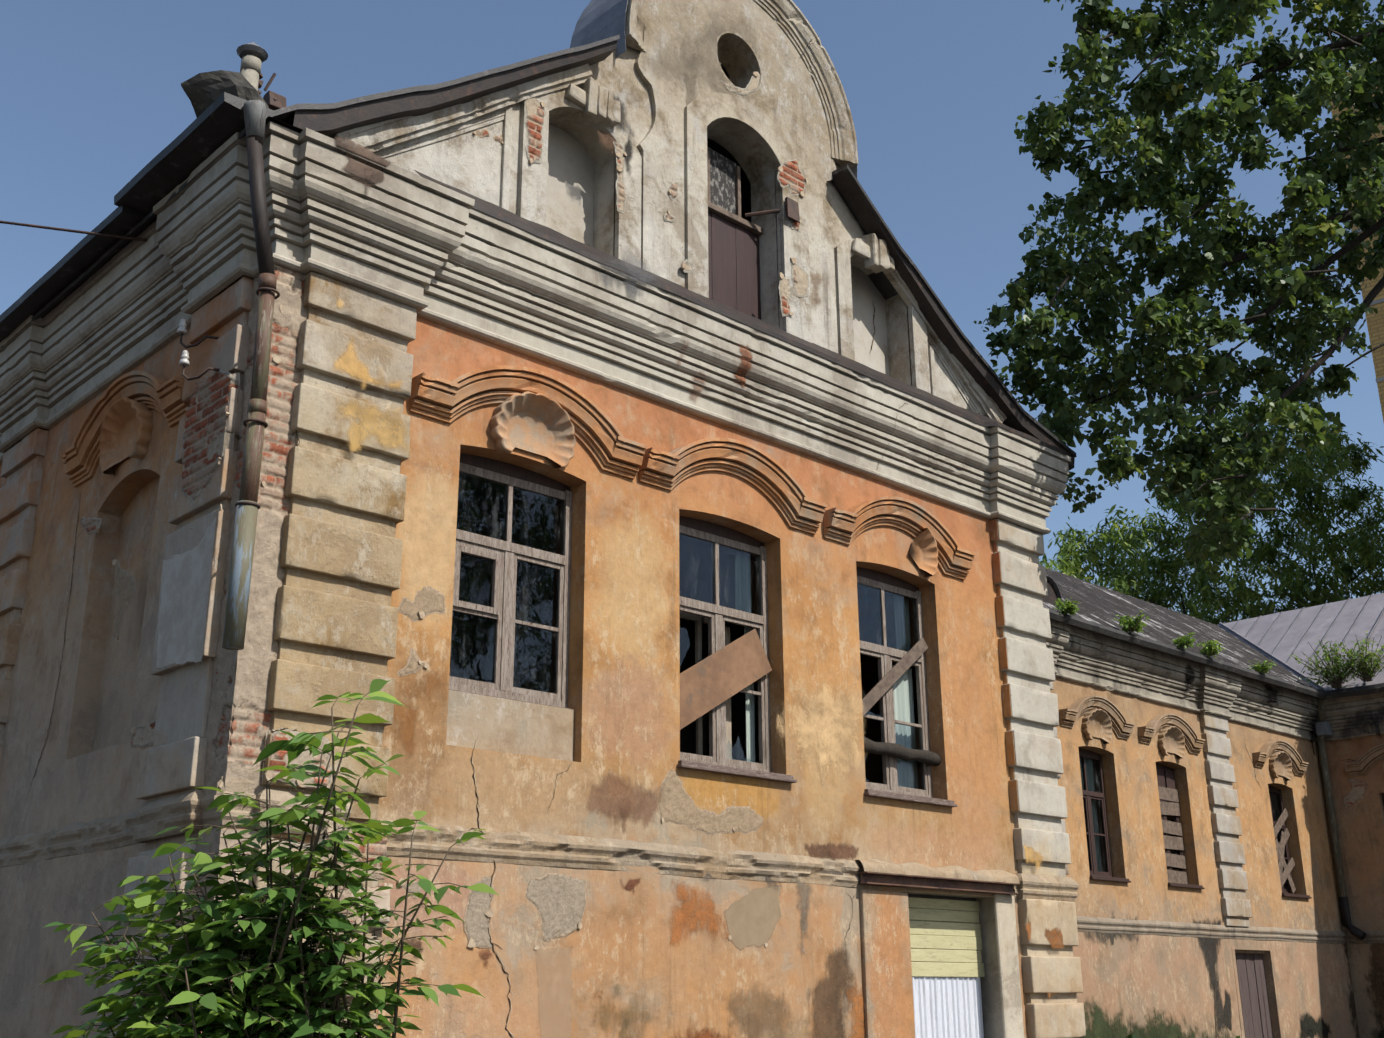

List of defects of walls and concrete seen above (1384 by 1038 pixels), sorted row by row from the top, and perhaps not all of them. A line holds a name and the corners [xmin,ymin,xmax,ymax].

crack [470,738,514,1037]